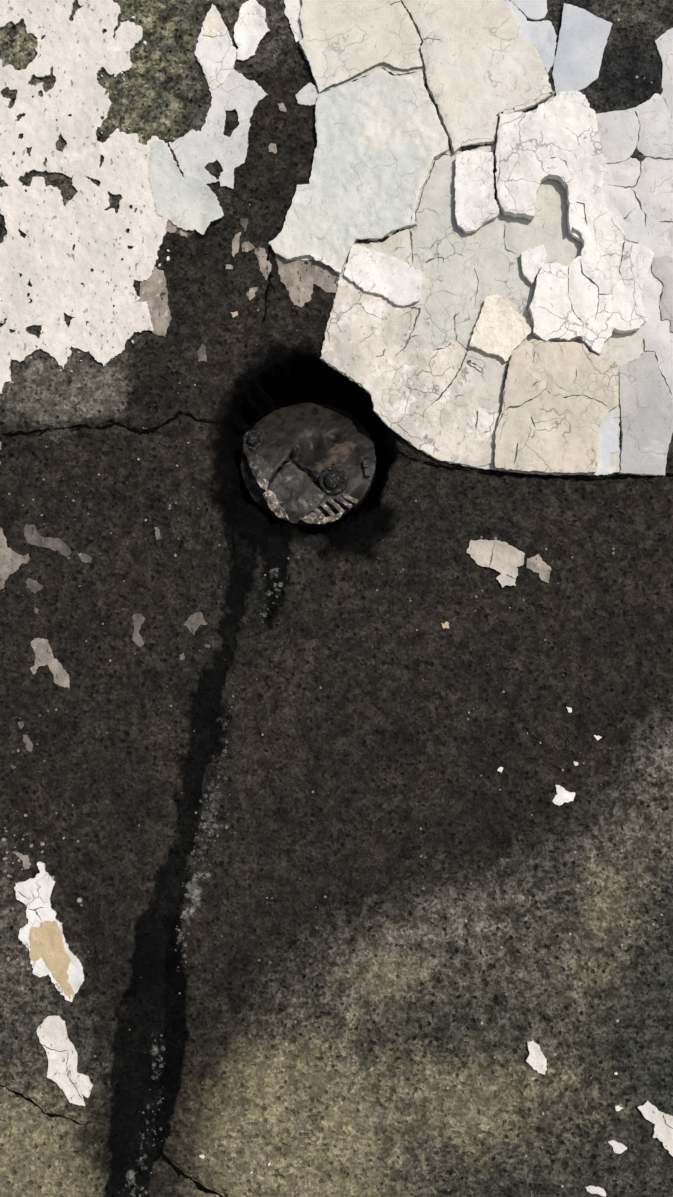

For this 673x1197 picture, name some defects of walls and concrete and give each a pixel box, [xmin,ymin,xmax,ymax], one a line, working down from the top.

peeling [0,0,673,476]
crack [0,411,224,436]
peeling [0,524,92,614]
peeling [466,537,551,588]
peeling [30,638,70,688]
water stain [0,56,394,1197]
water stain [162,425,673,1173]
peeling [12,851,84,1002]
peeling [36,1015,93,1106]
crack [150,1145,228,1197]
peeling [584,1185,606,1197]
peeling [615,1100,673,1156]